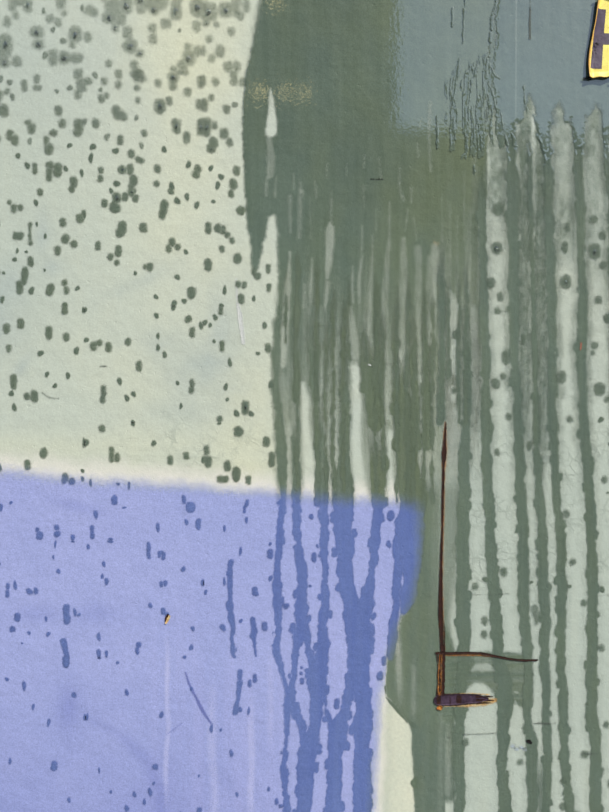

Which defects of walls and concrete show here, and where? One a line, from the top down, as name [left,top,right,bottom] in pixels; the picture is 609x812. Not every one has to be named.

leakage [29,0,93,100]
leakage [83,0,183,104]
leakage [0,119,36,145]
leakage [32,104,100,198]
leakage [95,135,145,266]
leakage [12,221,34,245]
leakage [53,209,87,256]
leakage [15,256,35,295]
leakage [45,279,71,315]
leakage [89,339,112,352]
leakage [9,374,39,403]
leakage [153,0,609,812]